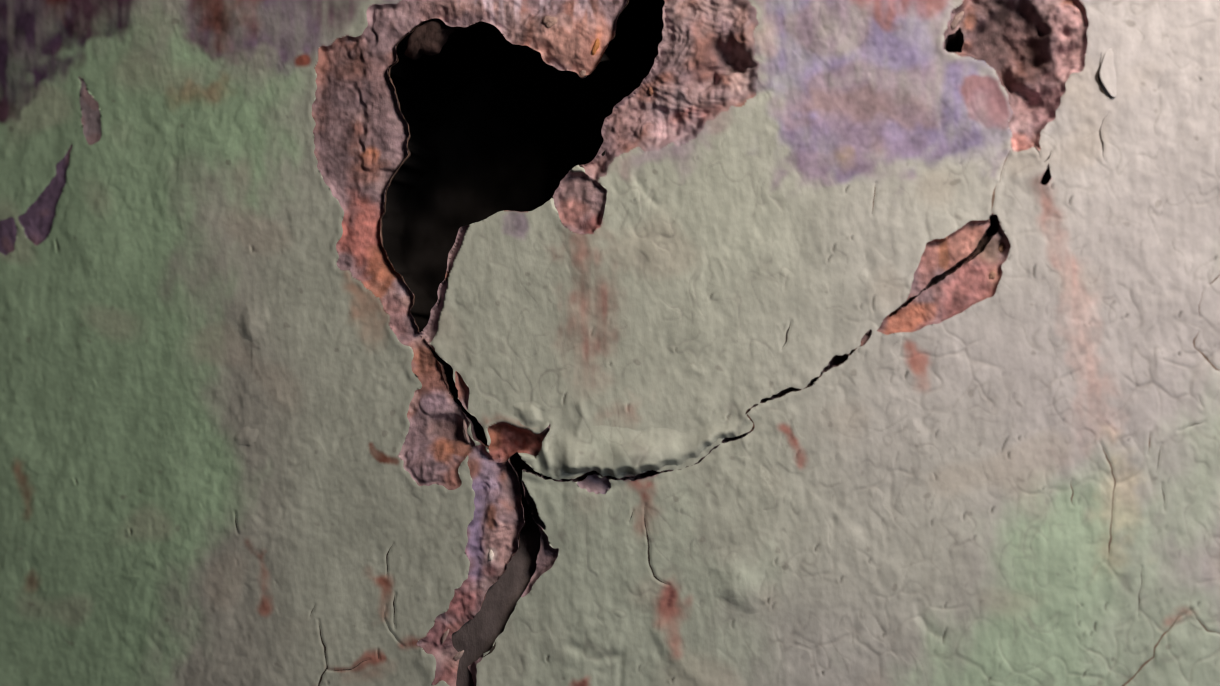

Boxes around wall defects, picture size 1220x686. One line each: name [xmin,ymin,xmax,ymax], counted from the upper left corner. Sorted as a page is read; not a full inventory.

peeling [0,0,144,256]
peeling [553,0,1116,234]
spalling [171,0,627,686]
spalling [860,213,1011,346]
crack [523,345,862,482]
crack [310,546,401,686]
rust [323,562,428,686]
crack [630,512,666,584]
rust [649,571,696,664]